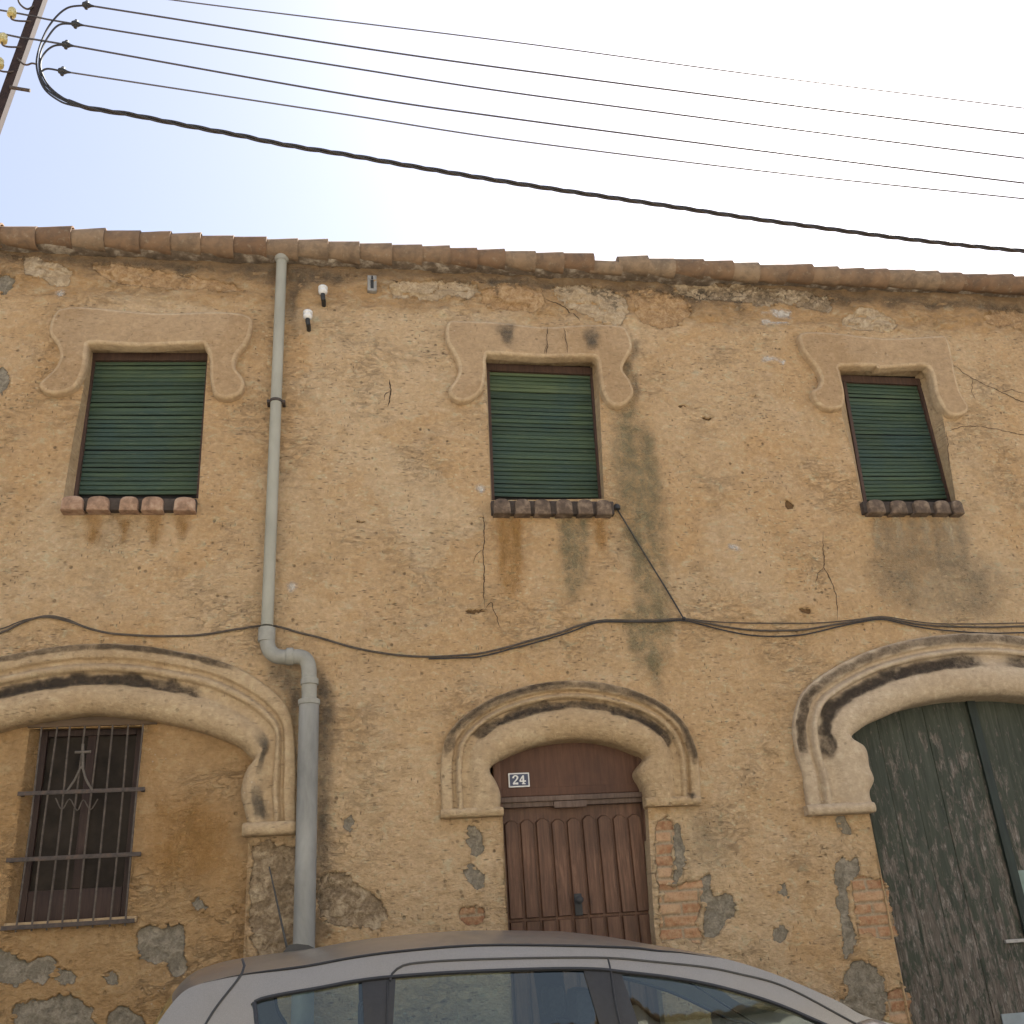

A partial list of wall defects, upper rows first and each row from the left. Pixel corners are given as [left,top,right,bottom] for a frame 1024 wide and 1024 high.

spalling [389,280,832,330]
crack [957,367,1024,402]
crack [466,517,499,625]
leakage [618,413,666,671]
crack [815,531,838,619]
spalling [136,896,208,977]
spalling [246,839,295,955]
spalling [316,872,388,930]
spalling [459,825,485,926]
flaking render [654,816,688,886]
spalling [833,856,913,1024]
spalling [0,947,145,1024]